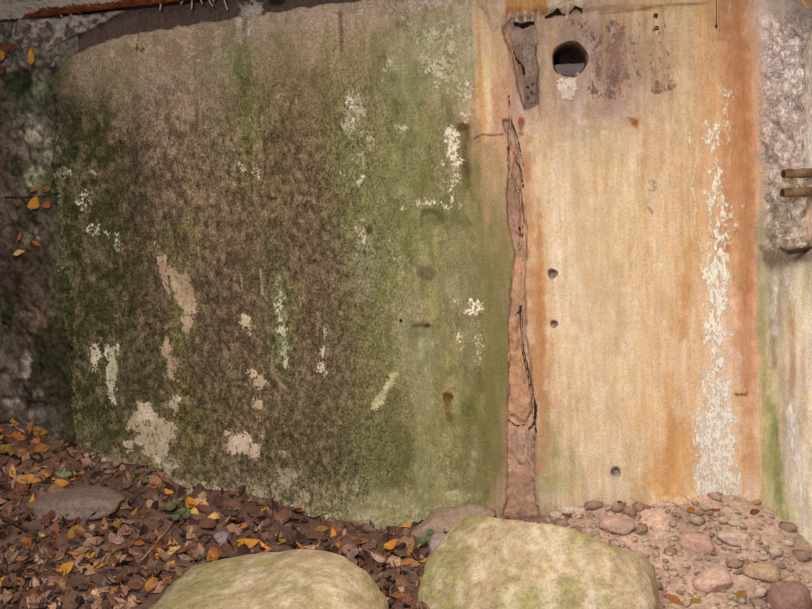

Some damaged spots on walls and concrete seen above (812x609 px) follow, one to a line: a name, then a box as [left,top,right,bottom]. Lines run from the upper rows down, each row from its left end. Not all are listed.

spalling [502,16,540,110]
peeling [161,336,179,382]
peeling [123,393,227,490]
peeling [153,242,200,337]
peeling [223,423,265,461]
efflorescence [259,269,290,390]
damp [349,394,481,527]
damp [407,312,445,382]
corrosion [443,393,453,419]
damp [451,298,485,315]
crack [507,306,537,440]
efflorescence [687,88,746,498]